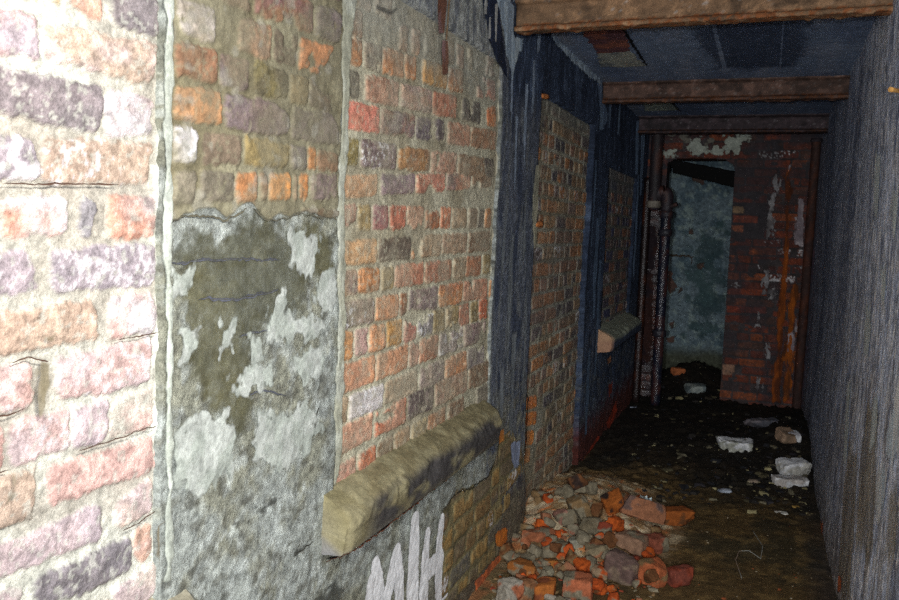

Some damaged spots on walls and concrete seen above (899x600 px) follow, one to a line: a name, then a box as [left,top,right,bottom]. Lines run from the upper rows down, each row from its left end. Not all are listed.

peeling [663,134,751,158]
water stain [182,213,333,434]
rust [772,167,799,403]
flaking render [442,164,670,600]
spalling [670,367,686,376]
crack [292,479,448,561]
spalling [632,564,694,589]